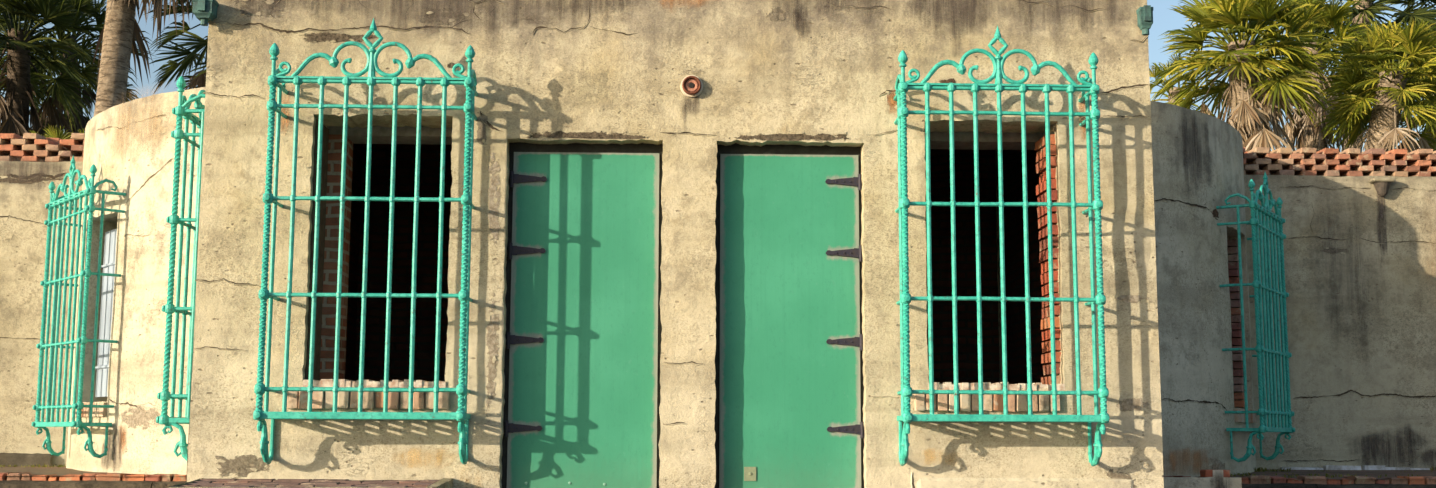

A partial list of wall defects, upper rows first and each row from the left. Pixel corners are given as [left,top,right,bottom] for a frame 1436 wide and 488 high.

crack [209,0,505,36]
crack [532,1,636,35]
water stain [795,12,808,33]
water stain [1378,196,1387,250]
crack [1161,398,1227,410]
crack [1293,390,1436,399]
water stain [1361,428,1436,467]